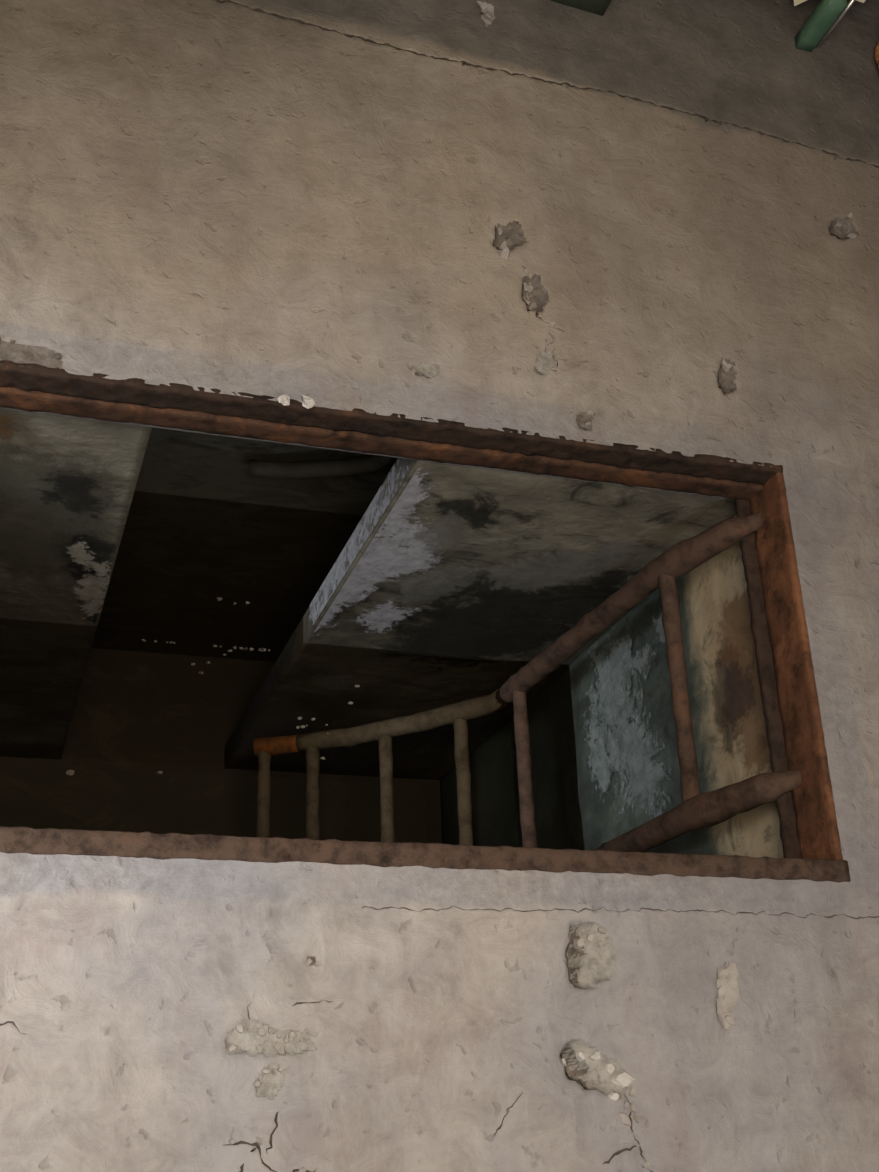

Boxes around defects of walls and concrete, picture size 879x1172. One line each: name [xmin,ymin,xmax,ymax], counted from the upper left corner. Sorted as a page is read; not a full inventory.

spalling [0,337,62,369]
water stain [309,458,637,671]
spalling [566,922,616,989]
crack [0,1017,27,1035]
spalling [716,962,740,1029]
spalling [560,1039,636,1102]
crack [602,1090,664,1172]